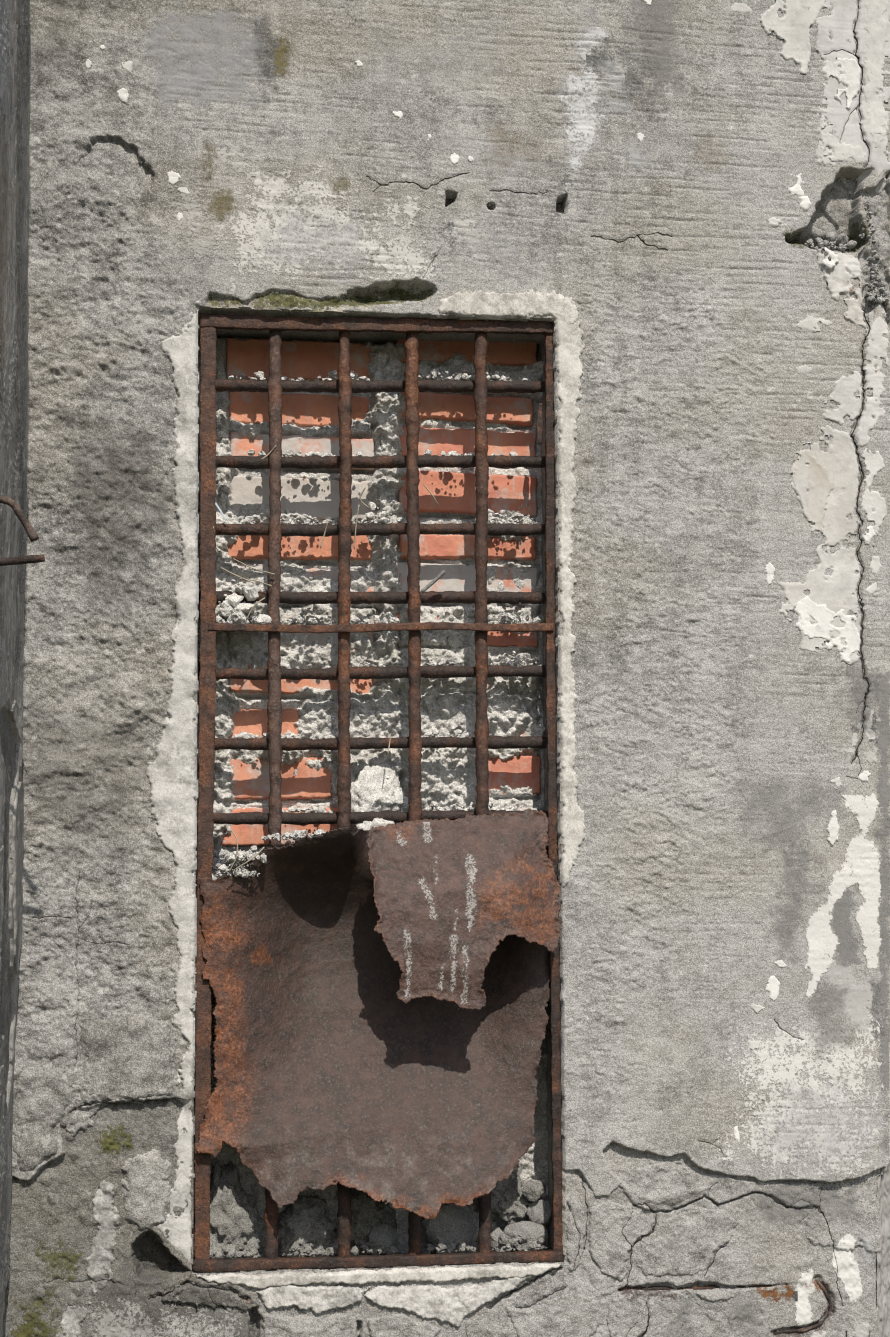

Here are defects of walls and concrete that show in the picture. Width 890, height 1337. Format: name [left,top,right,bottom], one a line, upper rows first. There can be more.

water stain [159,136,492,308]
peeling [730,0,890,665]
crack [848,307,871,778]
rust [195,808,562,1220]
spalling [0,700,890,1337]
crack [44,1245,248,1312]
crack [489,1176,588,1308]
crack [622,1134,870,1337]
rust [757,1284,794,1302]